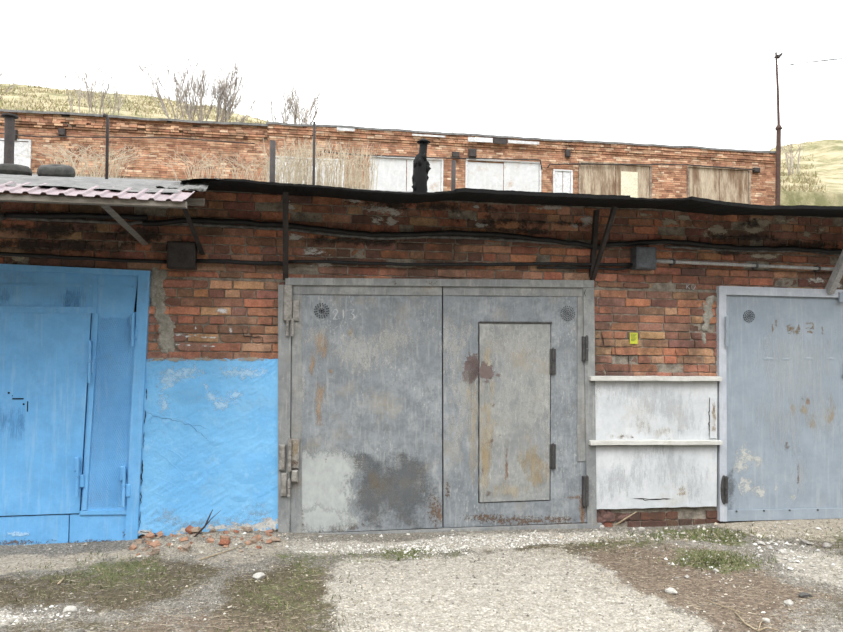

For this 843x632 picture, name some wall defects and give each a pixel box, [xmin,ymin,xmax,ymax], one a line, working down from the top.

crack [139,389,209,534]
damp [302,450,442,533]
rust [463,496,585,526]
peeling [734,443,777,498]